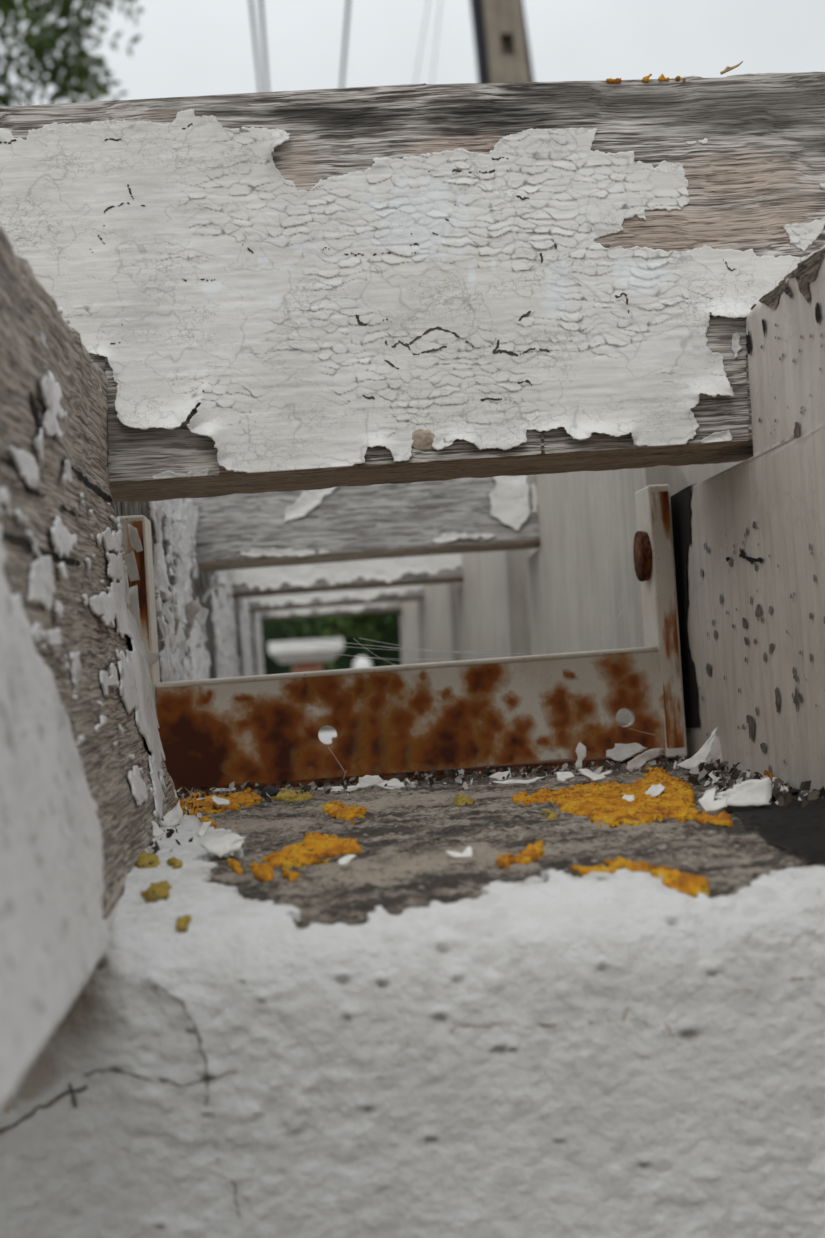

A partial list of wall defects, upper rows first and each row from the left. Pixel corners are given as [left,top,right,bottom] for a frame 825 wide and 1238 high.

peeling [0,75,825,444]
peeling [105,357,219,483]
peeling [357,427,658,466]
corrosion [652,491,671,535]
peeling [124,523,143,630]
corrosion [123,521,150,648]
peeling [174,599,209,641]
corrosion [665,607,680,664]
corrosion [156,652,685,789]
peeling [151,789,190,838]
spalling [197,727,806,929]
crack [0,985,250,1135]